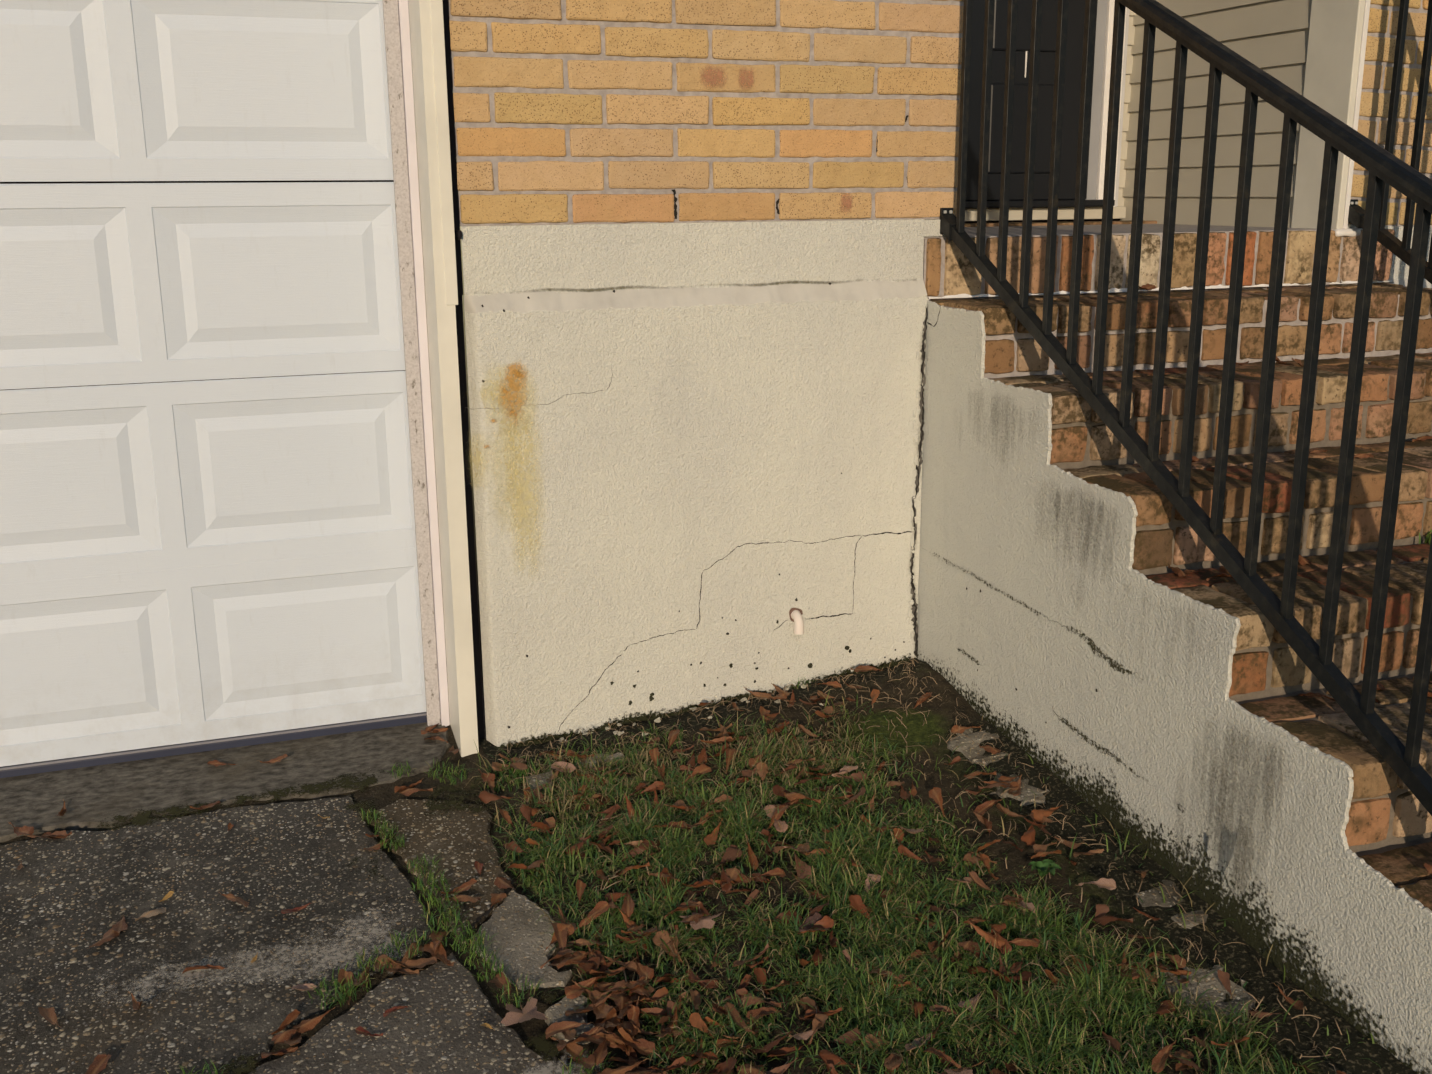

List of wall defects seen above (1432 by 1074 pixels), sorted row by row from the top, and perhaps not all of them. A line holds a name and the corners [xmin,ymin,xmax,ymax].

crack [559,306,1144,729]
crack [1052,706,1144,780]